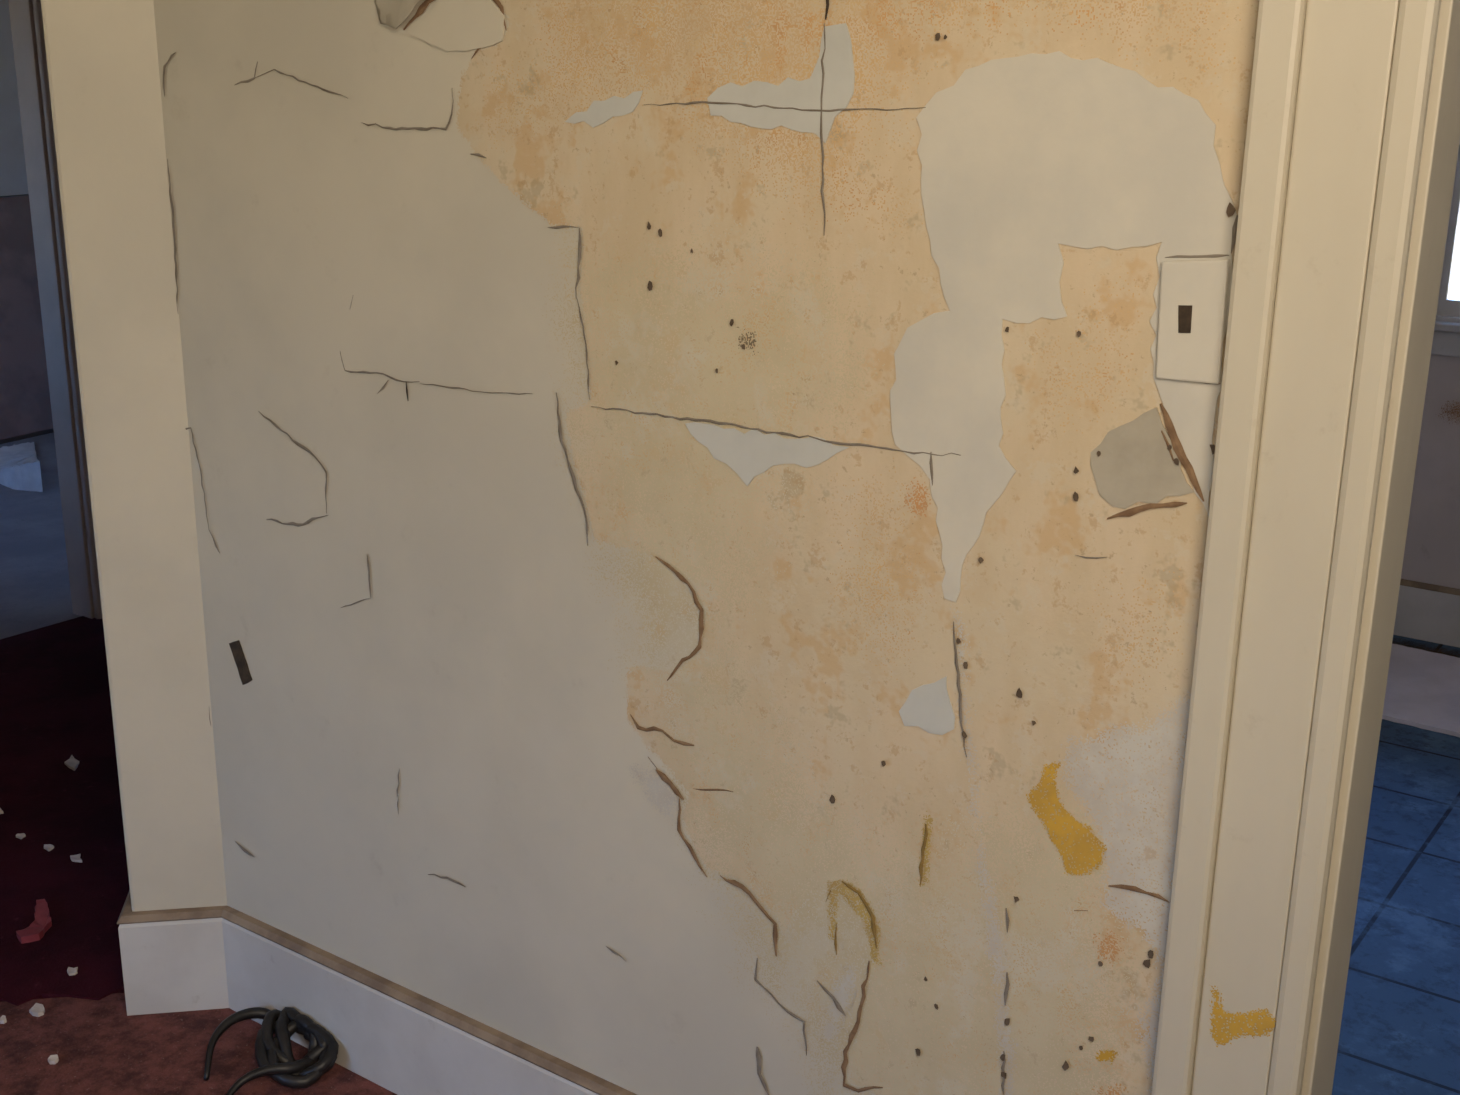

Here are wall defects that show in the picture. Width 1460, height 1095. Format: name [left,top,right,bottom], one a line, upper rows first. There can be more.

crack [163,52,176,96]
crack [235,62,486,158]
crack [646,0,926,234]
crack [167,159,178,311]
crack [340,225,961,546]
crack [185,427,220,553]
crack [260,413,328,527]
crack [341,555,371,608]
crack [655,556,704,681]
flaking render [410,0,1259,1095]
crack [953,622,967,757]
crack [1003,972,1011,1006]